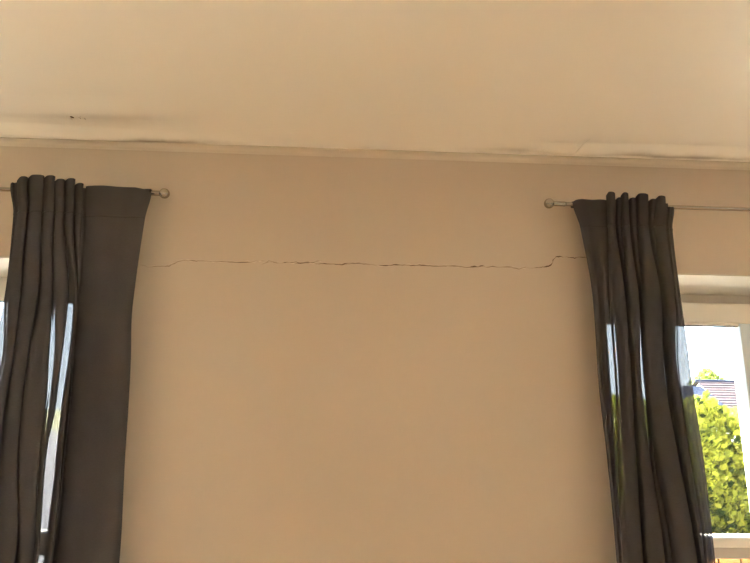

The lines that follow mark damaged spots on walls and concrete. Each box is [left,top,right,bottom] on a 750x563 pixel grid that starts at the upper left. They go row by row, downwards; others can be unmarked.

crack [146,256,586,269]